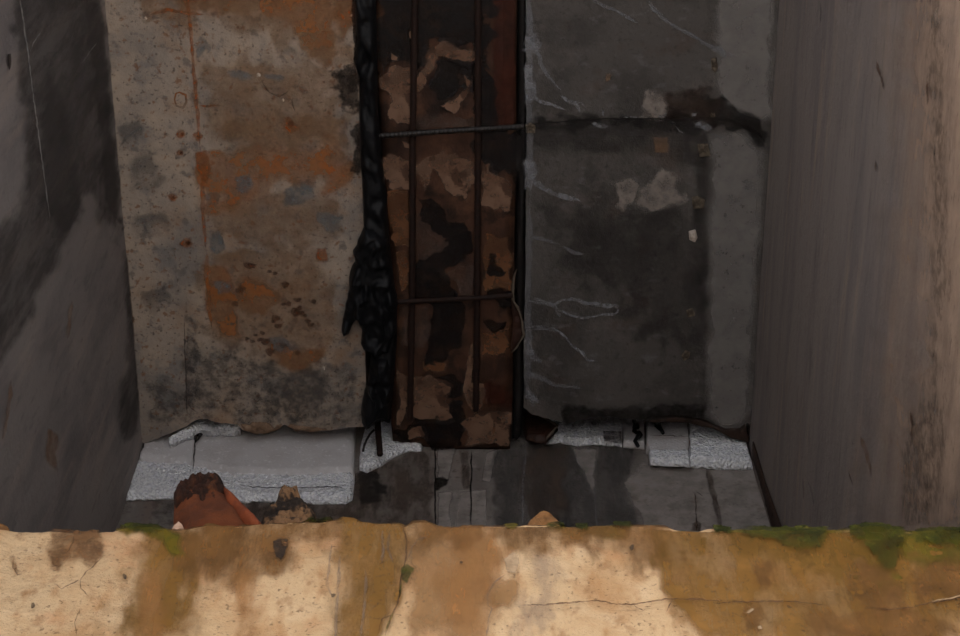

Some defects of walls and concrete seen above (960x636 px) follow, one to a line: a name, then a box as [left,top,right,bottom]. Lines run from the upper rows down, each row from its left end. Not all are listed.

peeling [379,41,475,128]
crack [536,110,761,137]
peeling [382,141,514,296]
mould [150,337,352,427]
peeling [396,326,512,447]
leakage [121,367,960,636]
crack [531,598,822,610]
crack [869,595,960,610]